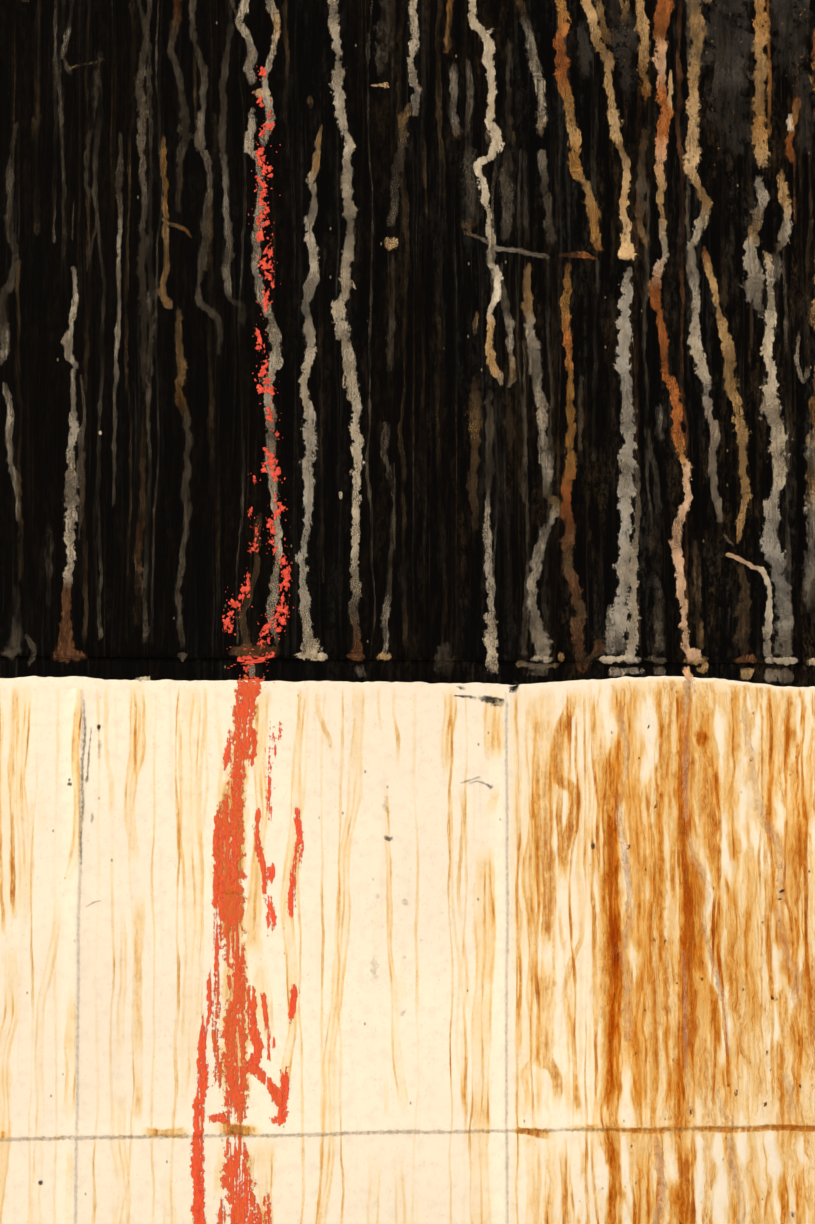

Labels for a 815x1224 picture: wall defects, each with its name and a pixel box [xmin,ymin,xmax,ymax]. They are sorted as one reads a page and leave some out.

water stain [117,0,290,308]
water stain [330,26,355,157]
water stain [465,0,734,692]
water stain [743,236,815,407]
water stain [238,327,317,658]
water stain [732,466,797,677]
rust [595,818,618,970]
rust [677,805,694,935]
rust [676,888,723,999]
rust [796,833,810,972]
rust [226,1125,249,1135]
rust [678,1136,695,1224]